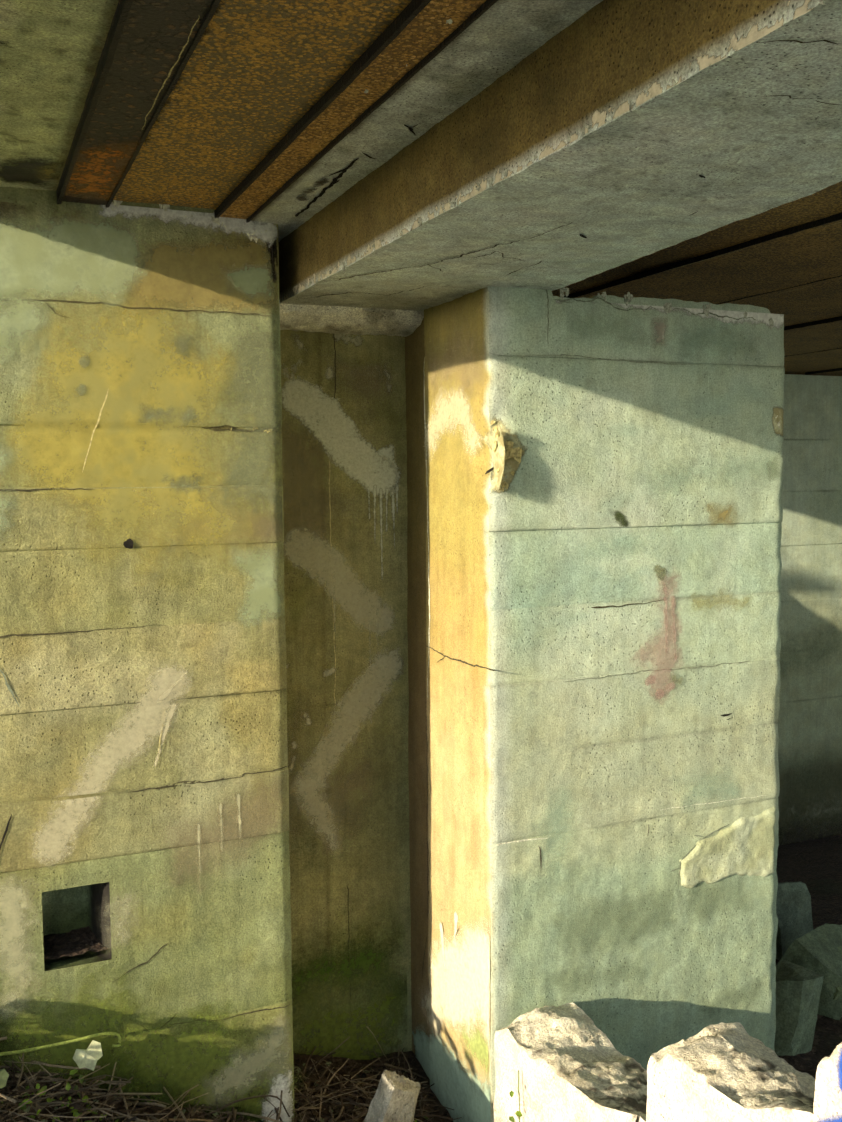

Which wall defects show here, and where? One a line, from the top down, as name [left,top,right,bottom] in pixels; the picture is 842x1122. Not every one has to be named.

leakage [0,158,58,187]
corrosion [67,0,412,209]